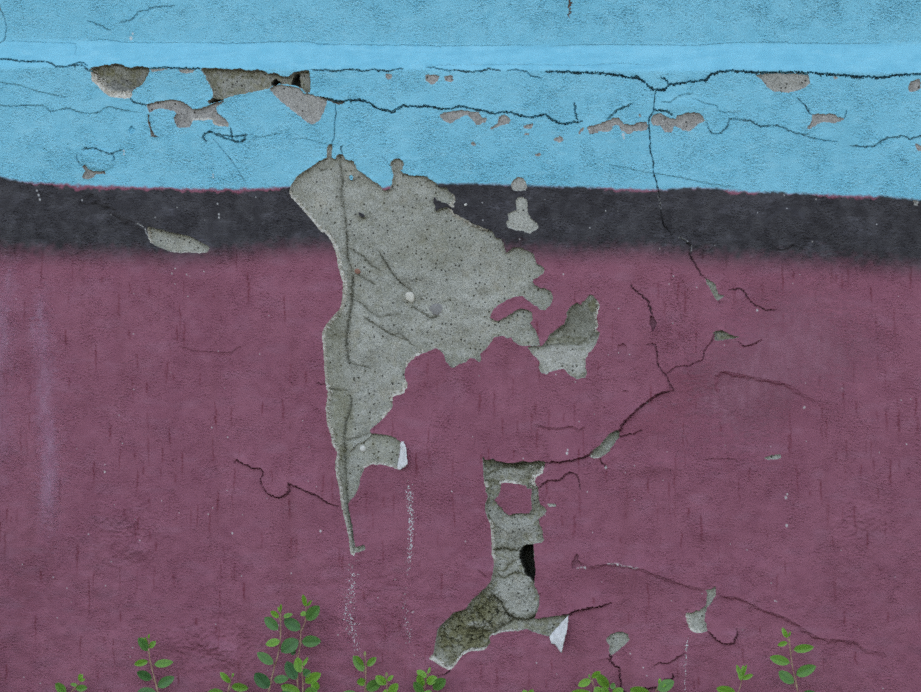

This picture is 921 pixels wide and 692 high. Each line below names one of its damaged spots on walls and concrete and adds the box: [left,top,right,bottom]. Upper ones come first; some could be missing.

spalling [90,63,167,99]
spalling [147,68,327,128]
crack [0,5,921,279]
peeling [578,112,705,134]
spalling [147,227,210,253]
spalling [289,144,600,556]
crack [618,334,842,438]
crack [233,459,339,507]
crack [538,451,607,491]
spalling [429,457,569,670]
crack [562,602,612,616]
crack [582,563,908,665]